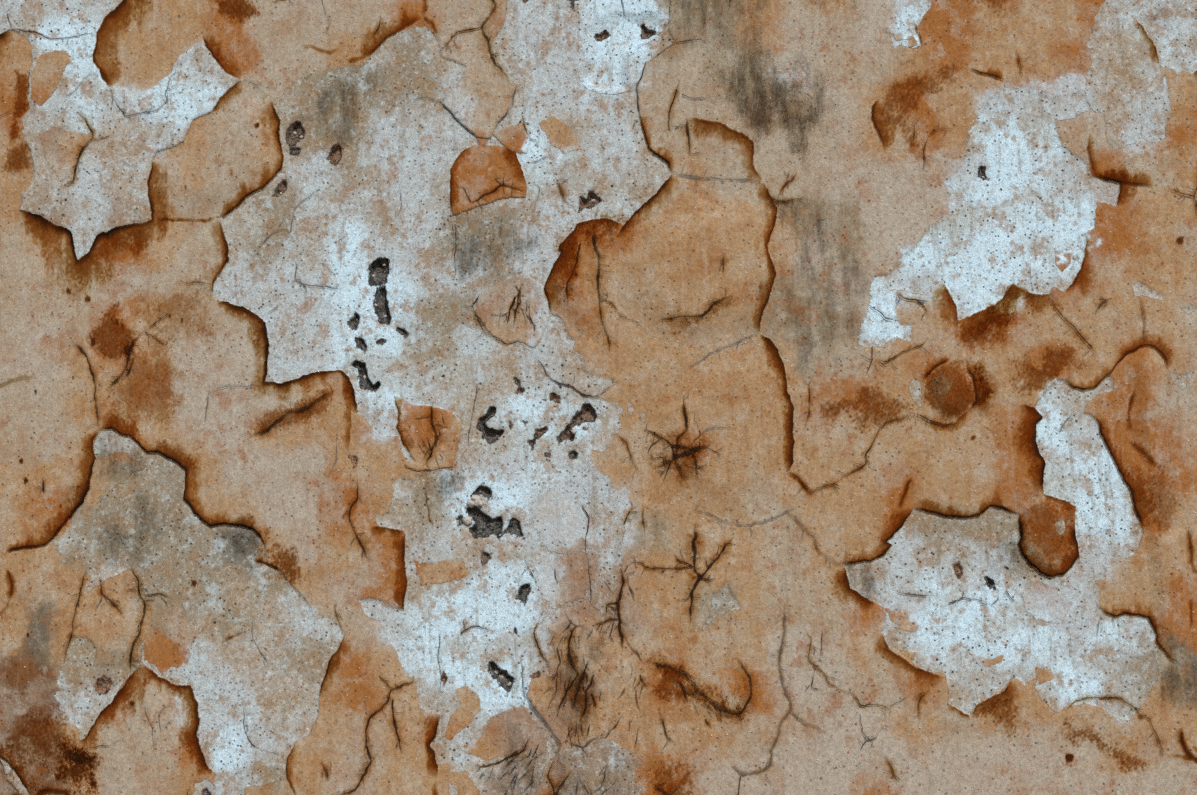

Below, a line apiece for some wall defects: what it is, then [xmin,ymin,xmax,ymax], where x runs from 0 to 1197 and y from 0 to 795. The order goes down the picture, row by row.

peeling [0,0,241,260]
peeling [857,0,1197,348]
rust [55,742,101,795]
peeling [51,429,345,795]
peeling [213,0,674,795]
crack [437,620,495,673]
crack [477,401,951,795]
crack [897,591,1016,607]
peeling [844,375,1162,721]